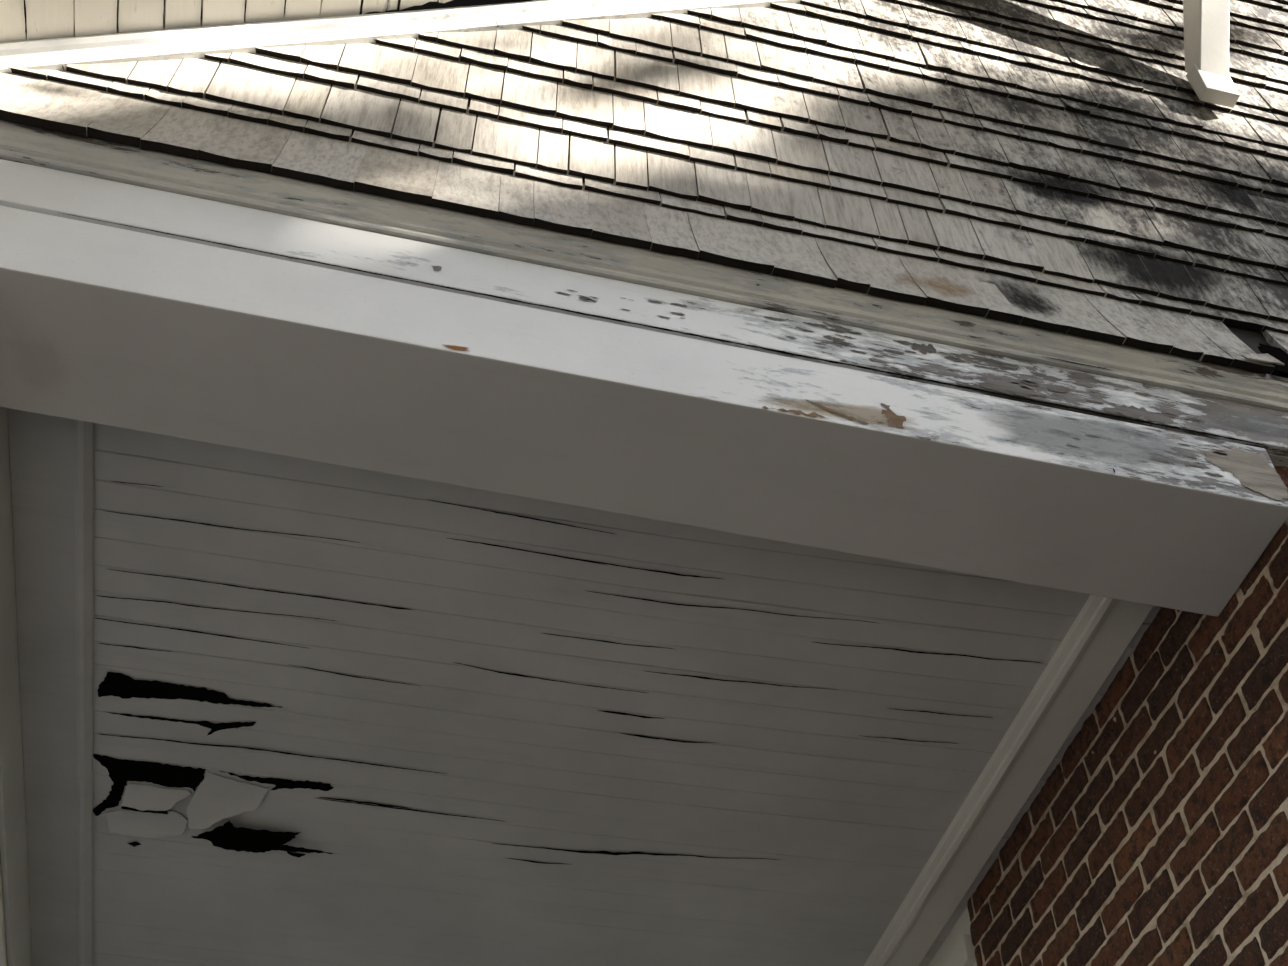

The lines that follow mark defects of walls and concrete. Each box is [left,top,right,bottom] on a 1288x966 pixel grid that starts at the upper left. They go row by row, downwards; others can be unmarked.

crack [21,0,29,37]
peeling [764,316,969,378]
peeling [762,399,906,429]
peeling [979,366,1204,424]
peeling [1139,443,1288,500]
crack [431,500,1041,663]
crack [96,569,418,686]
peeling [98,672,282,708]
crack [453,633,836,743]
crack [100,712,446,774]
peeling [93,754,335,858]
crack [317,797,777,865]